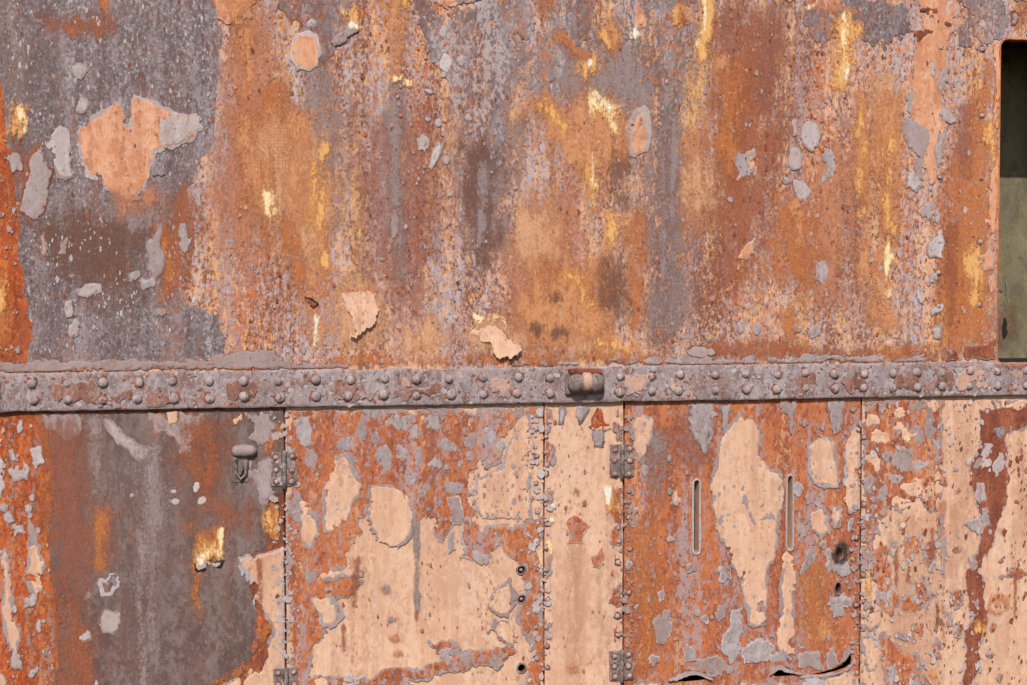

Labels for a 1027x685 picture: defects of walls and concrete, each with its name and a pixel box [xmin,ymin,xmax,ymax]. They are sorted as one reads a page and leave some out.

corrosion [7,0,455,387]
peeling [0,0,654,685]
peeling [413,0,699,182]
corrosion [442,11,711,403]
peeling [733,147,757,181]
peeling [783,119,836,201]
peeling [815,260,828,285]
corrosion [666,0,1000,461]
corrosion [39,422,114,685]
corrosion [180,418,284,616]
peeling [605,318,1027,685]
corrosion [865,477,1027,685]